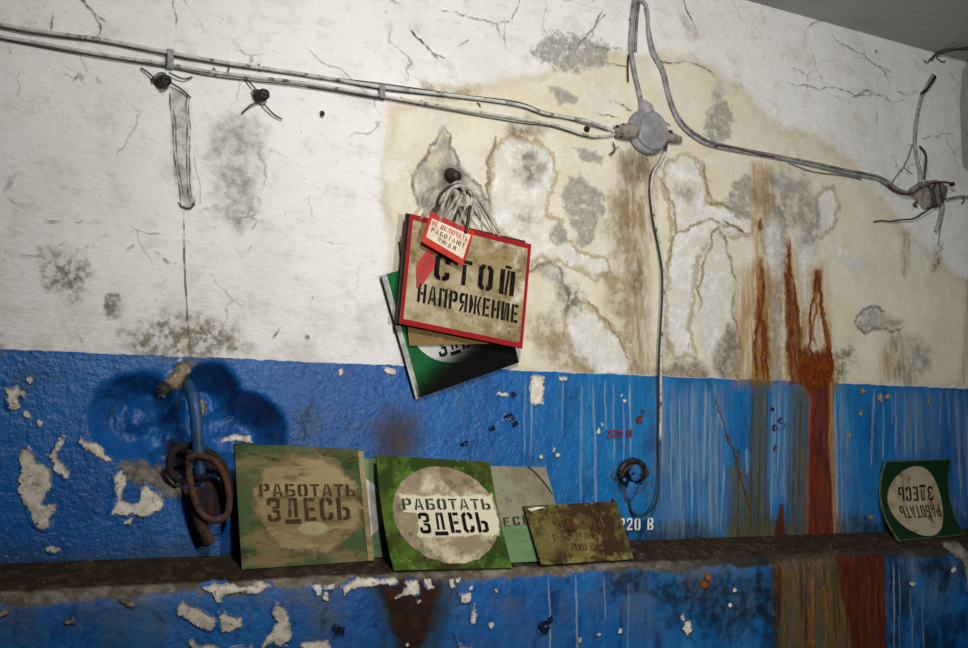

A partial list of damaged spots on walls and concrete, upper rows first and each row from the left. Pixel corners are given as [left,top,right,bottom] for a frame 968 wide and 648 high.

crack [410,0,520,58]
crack [801,20,916,101]
water stain [384,53,968,387]
water stain [52,262,85,288]
peeling [4,376,44,427]
rust [729,240,838,537]
peeling [221,432,253,443]
peeling [17,434,186,533]
peeling [177,580,346,648]
peeling [311,575,434,604]
peeling [449,577,477,624]
rust [771,554,886,648]